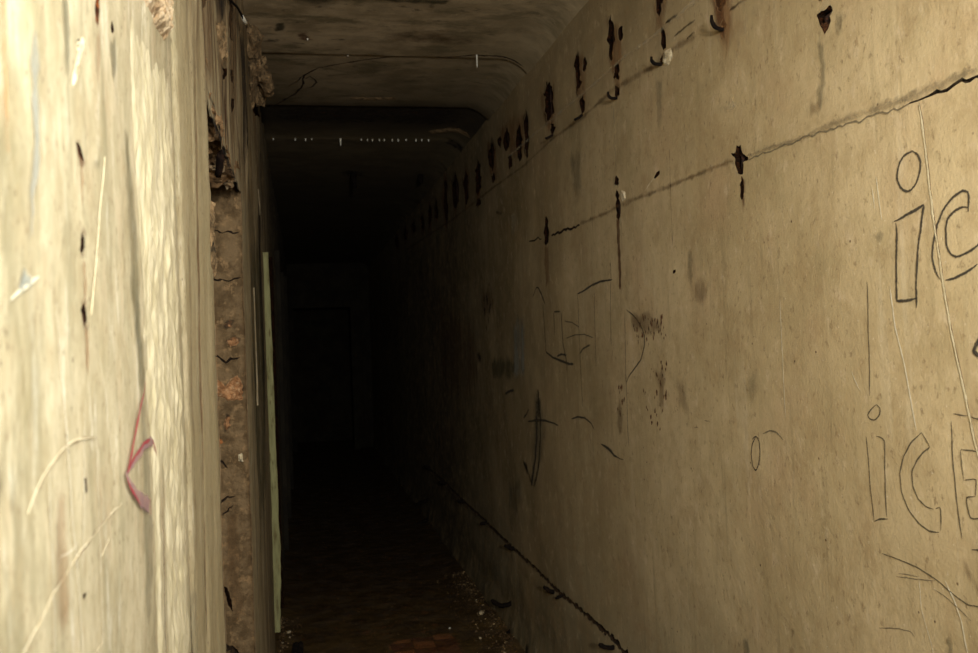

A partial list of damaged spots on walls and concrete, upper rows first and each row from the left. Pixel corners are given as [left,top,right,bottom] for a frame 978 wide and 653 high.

spalling [144,0,174,40]
crack [908,75,978,104]
crack [529,224,579,242]
crack [216,355,240,364]
crack [221,496,235,514]
crack [427,469,628,653]
crack [226,644,239,653]